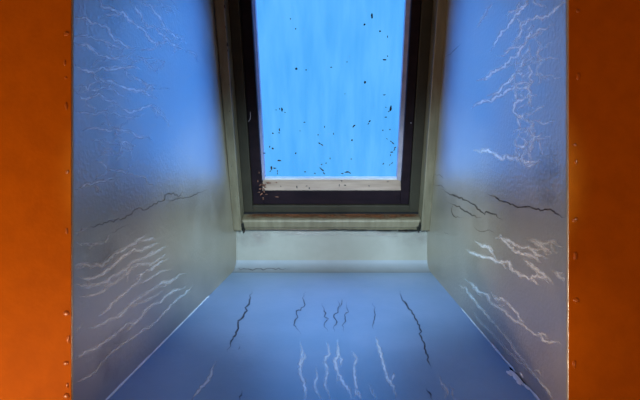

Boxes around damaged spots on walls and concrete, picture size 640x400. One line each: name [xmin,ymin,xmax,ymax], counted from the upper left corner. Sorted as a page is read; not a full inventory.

damp [474,0,560,167]
crack [453,195,557,217]
damp [80,238,151,286]
damp [471,238,554,282]
crack [230,299,250,345]
crack [402,300,429,362]
damp [467,284,555,393]
damp [314,347,360,397]
damp [377,341,396,394]